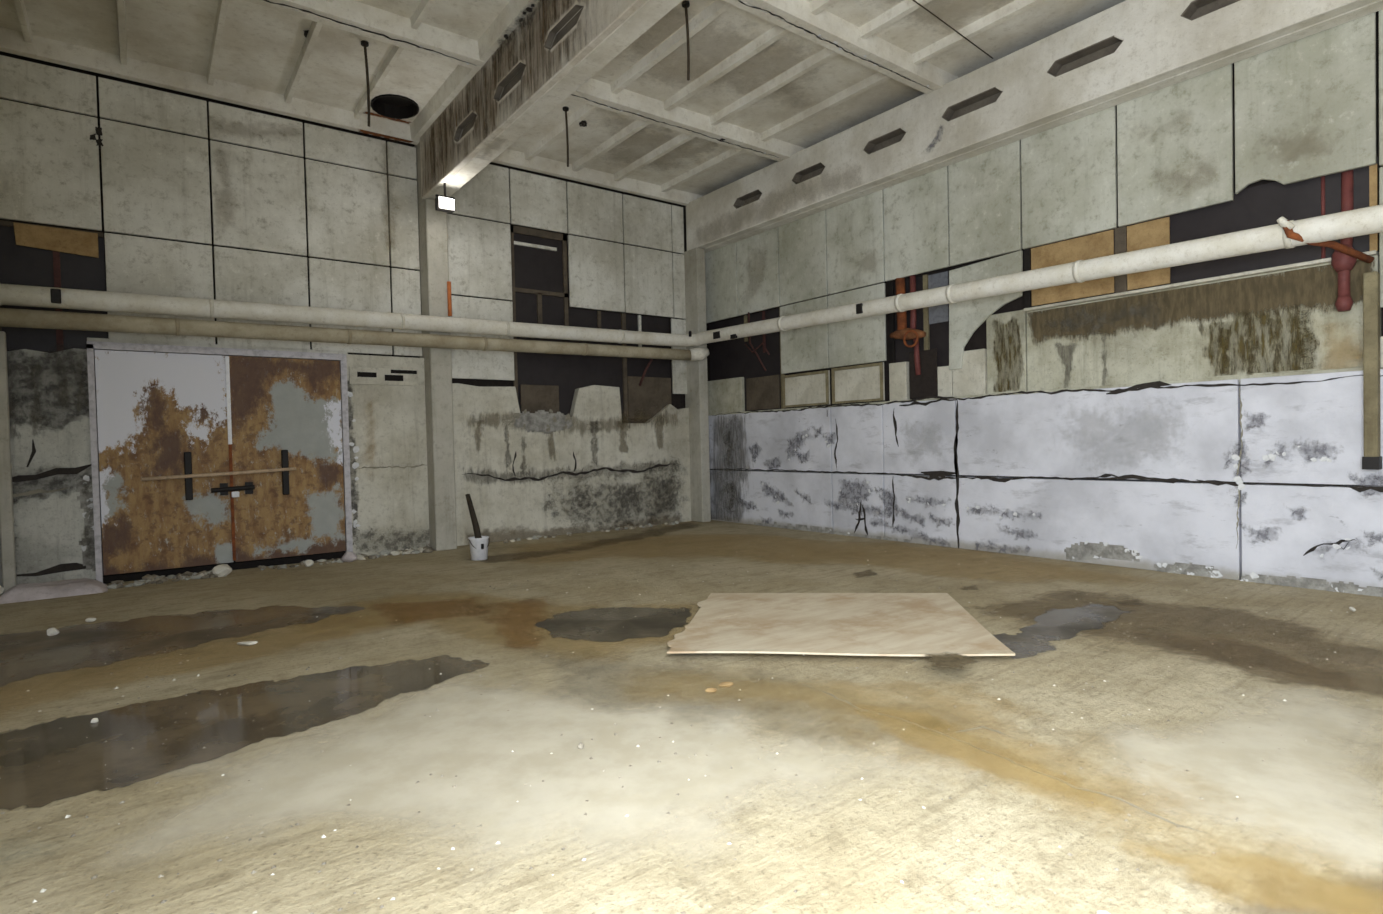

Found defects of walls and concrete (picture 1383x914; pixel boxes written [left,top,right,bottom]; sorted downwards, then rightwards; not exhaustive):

damp [1028,260,1375,378]
damp [7,345,89,433]
spalling [513,409,573,434]
crack [462,452,681,483]
damp [545,467,686,527]
damp [710,415,749,520]
crack [712,375,1383,548]